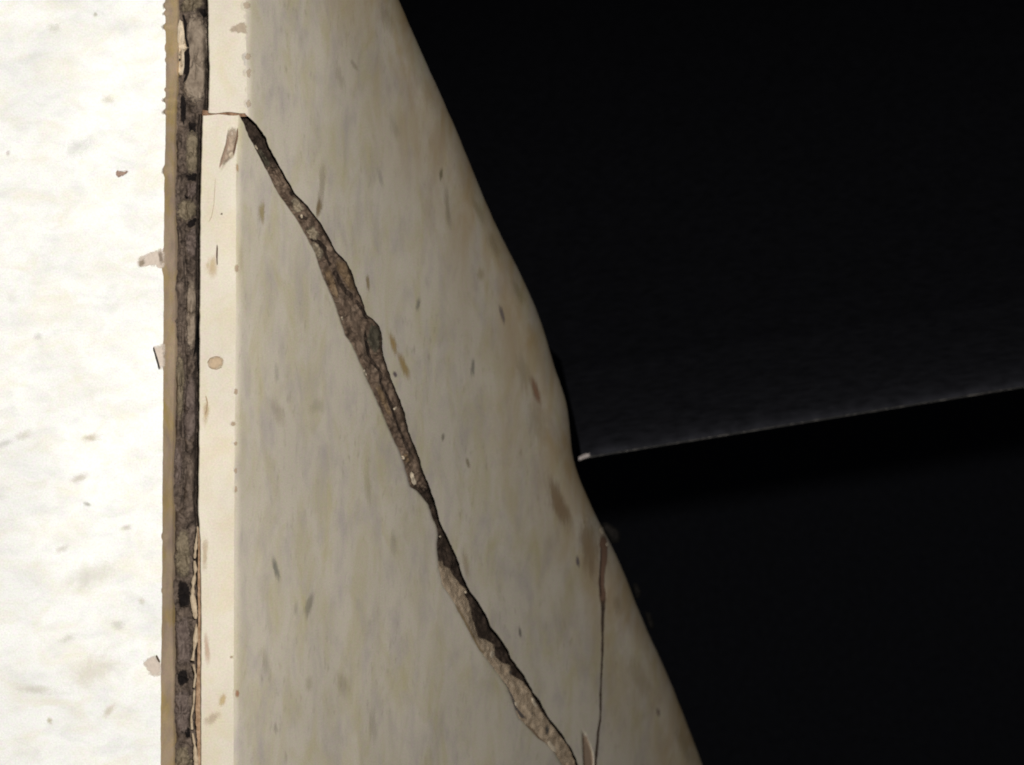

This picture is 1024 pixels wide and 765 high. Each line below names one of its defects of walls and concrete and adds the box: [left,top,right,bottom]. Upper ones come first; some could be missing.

crack [202,110,608,765]